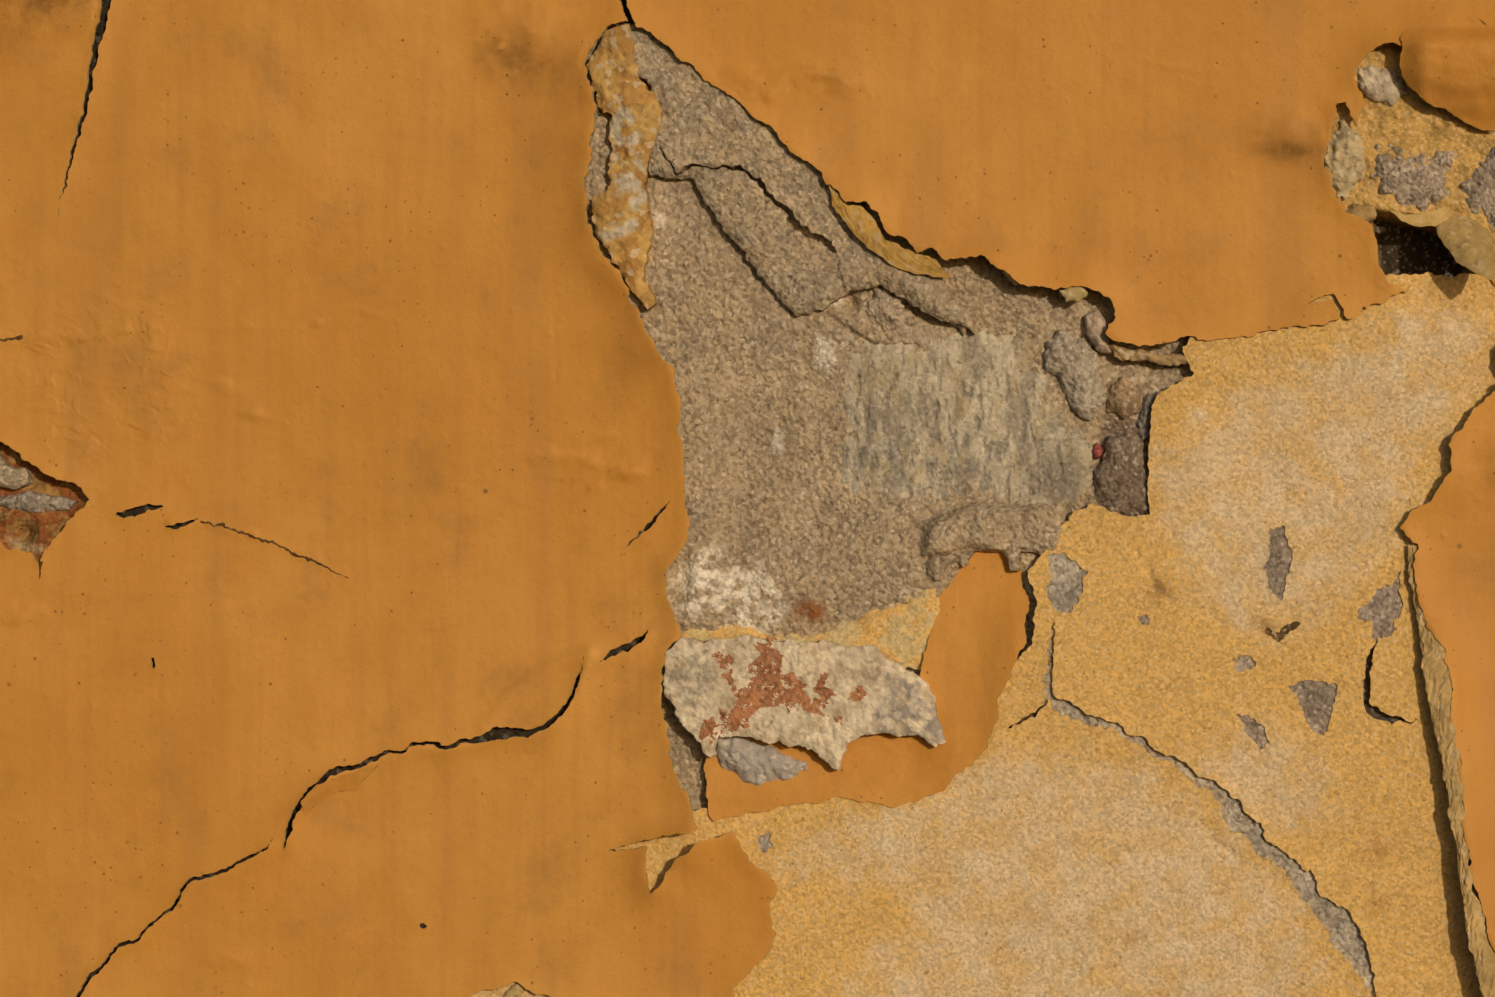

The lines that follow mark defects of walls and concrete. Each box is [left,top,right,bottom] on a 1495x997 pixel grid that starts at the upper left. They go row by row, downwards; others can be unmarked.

crack [63,0,111,193]
crack [0,334,23,342]
spalling [0,442,89,562]
crack [116,504,348,578]
crack [619,522,653,551]
peeling [585,10,1495,997]
crack [1363,641,1411,724]
crack [77,630,648,997]
crack [1009,623,1377,997]
peeling [467,982,550,997]